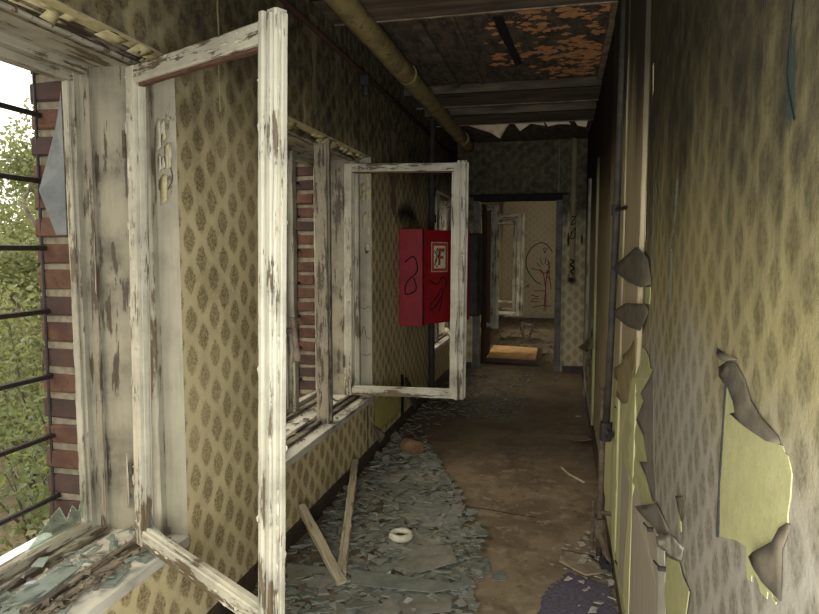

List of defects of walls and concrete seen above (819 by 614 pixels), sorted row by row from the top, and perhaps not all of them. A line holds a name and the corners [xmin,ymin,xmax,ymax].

peeling [8,0,182,62]
peeling [484,4,611,79]
peeling [618,460,666,614]